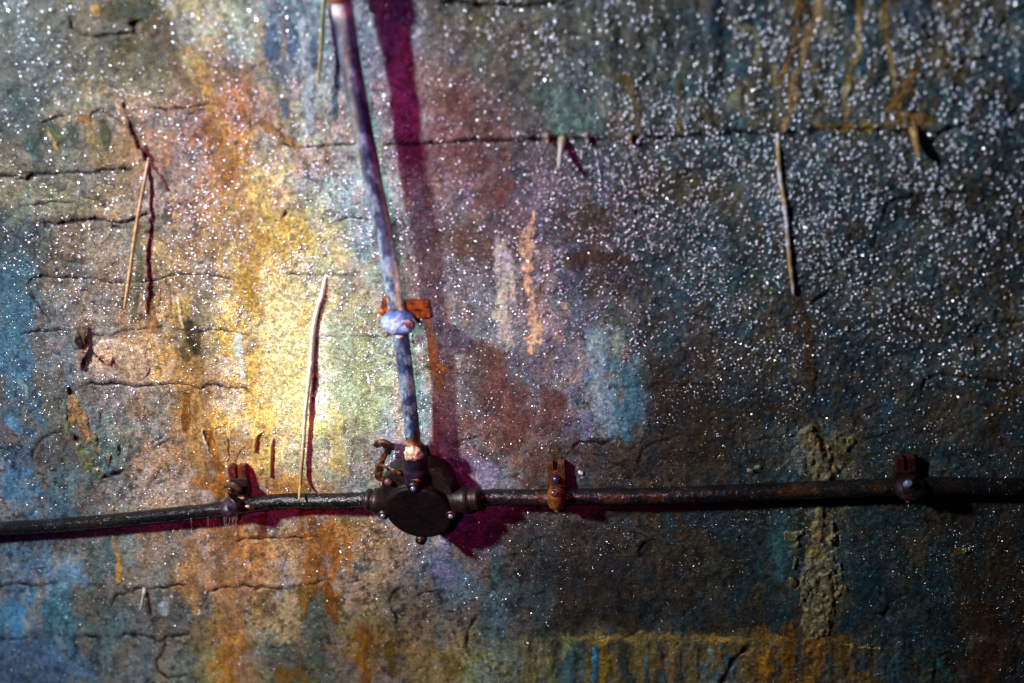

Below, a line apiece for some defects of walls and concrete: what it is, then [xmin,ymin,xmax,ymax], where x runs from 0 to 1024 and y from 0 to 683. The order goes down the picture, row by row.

rust [813,56,935,134]
crack [0,100,151,229]
rust [161,41,280,296]
crack [398,129,826,145]
crack [21,258,78,335]
crack [91,326,247,336]
crack [70,382,246,392]
rust [172,334,228,499]
water stain [791,418,857,481]
rust [114,539,122,583]
rust [296,508,351,625]
water stain [518,502,885,683]